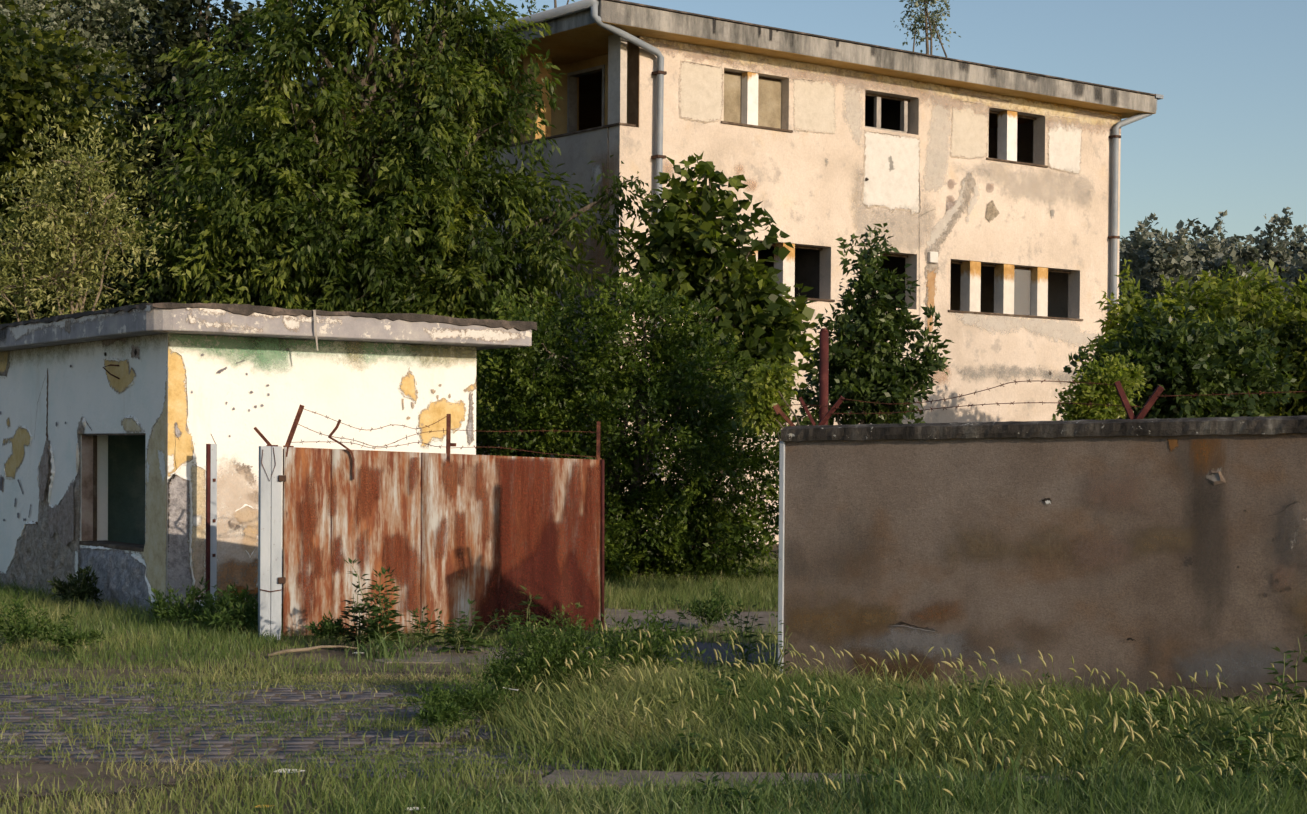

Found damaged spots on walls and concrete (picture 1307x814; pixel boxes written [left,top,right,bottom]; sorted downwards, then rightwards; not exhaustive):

peeling [0,305,152,379]
peeling [397,368,477,449]
spalling [0,338,206,617]
peeling [228,458,259,559]
rust [298,466,421,622]
rust [409,457,419,491]
rust [437,458,601,633]